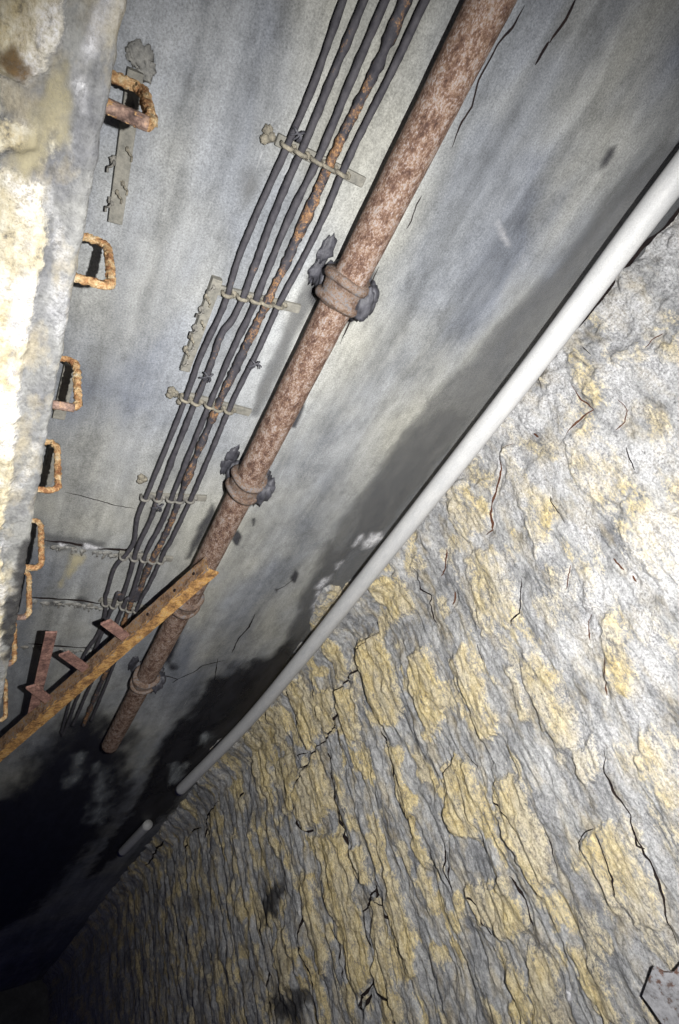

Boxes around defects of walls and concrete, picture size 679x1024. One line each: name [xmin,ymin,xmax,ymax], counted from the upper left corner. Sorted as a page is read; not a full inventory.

crack [452,7,524,147]
crack [535,0,576,65]
water stain [0,145,679,929]